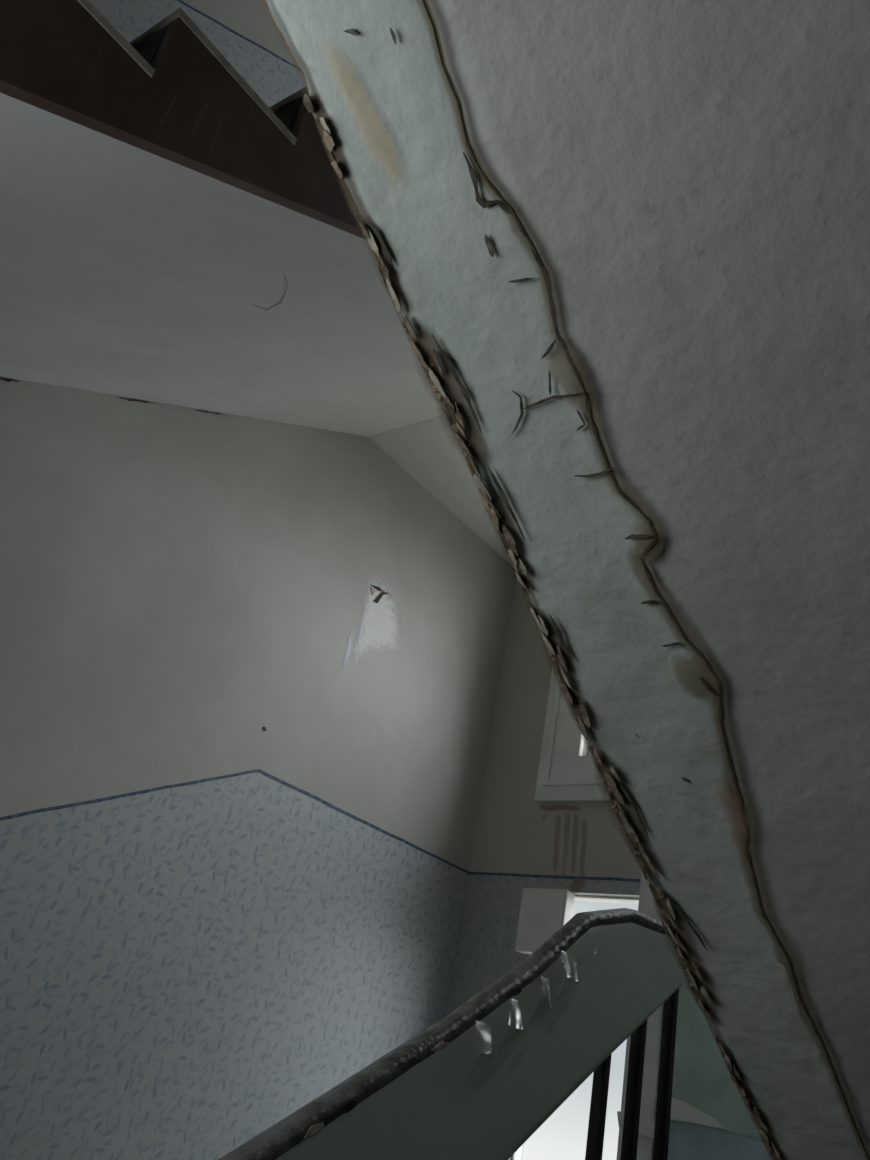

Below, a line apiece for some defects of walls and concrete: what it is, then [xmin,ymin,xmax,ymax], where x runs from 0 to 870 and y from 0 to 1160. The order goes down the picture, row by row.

crack [422,0,870,1160]